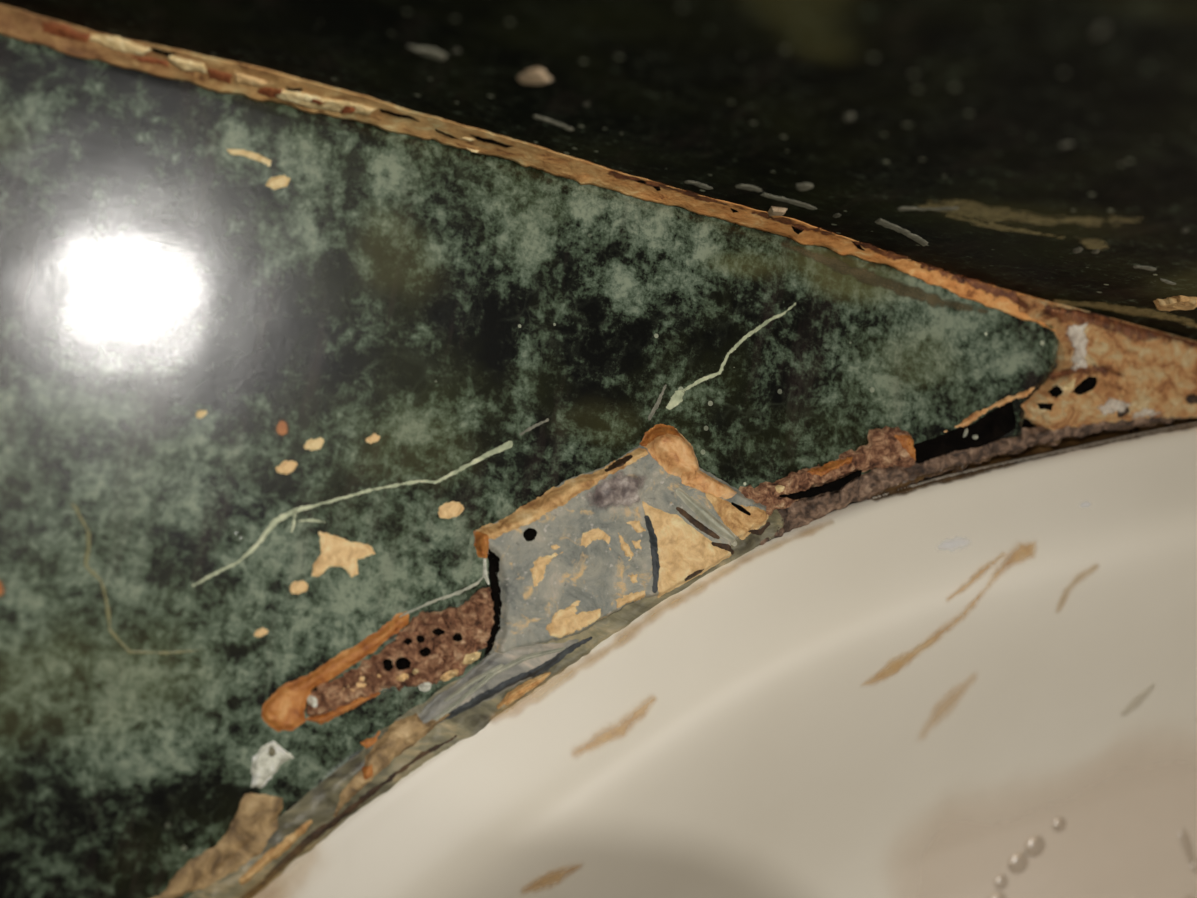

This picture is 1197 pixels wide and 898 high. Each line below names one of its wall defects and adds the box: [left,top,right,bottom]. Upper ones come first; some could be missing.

corrosion [208,69,233,84]
corrosion [257,87,283,98]
corrosion [1042,305,1197,347]
crack [648,303,796,420]
corrosion [1049,365,1123,380]
corrosion [277,421,287,435]
corrosion [944,387,1035,433]
corrosion [739,426,916,516]
peeling [261,424,771,732]
corrosion [957,545,1033,593]
corrosion [872,630,944,681]
peeling [239,820,312,885]